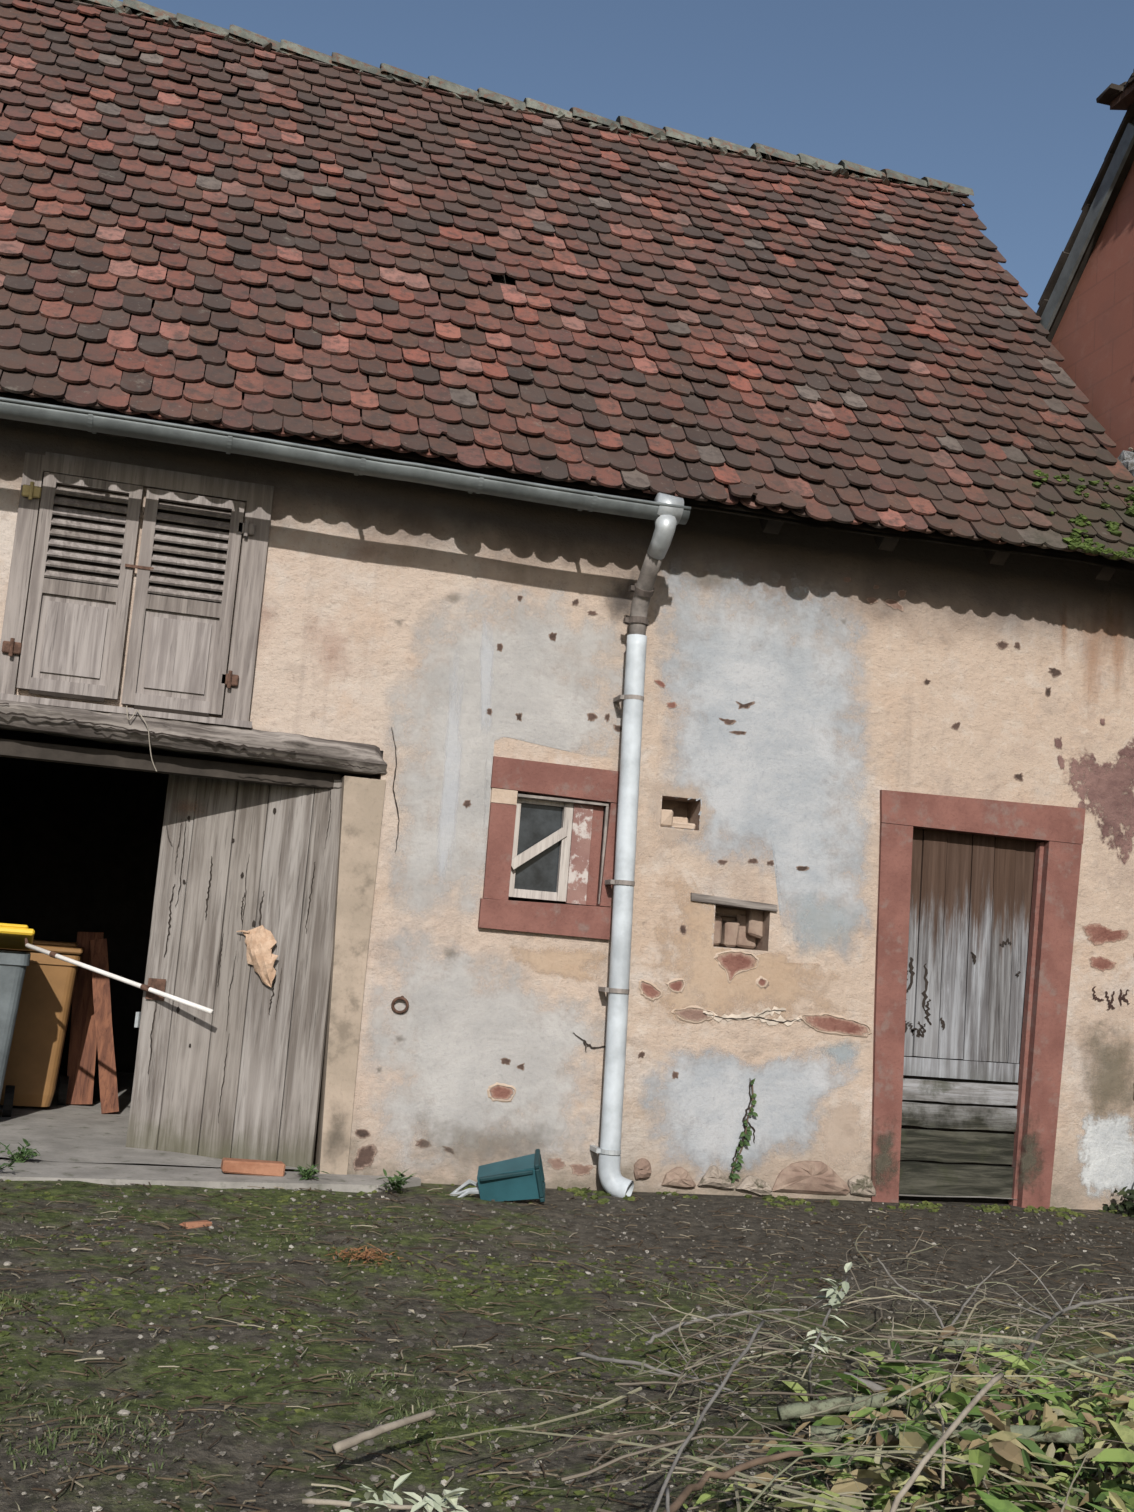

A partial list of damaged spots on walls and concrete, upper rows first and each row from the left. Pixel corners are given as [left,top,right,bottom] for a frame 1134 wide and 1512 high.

crack [391,727,399,851]
peeling [654,574,869,941]
flaking render [1054,737,1134,864]
flaking render [1083,923,1128,972]
peeling [634,881,876,1197]